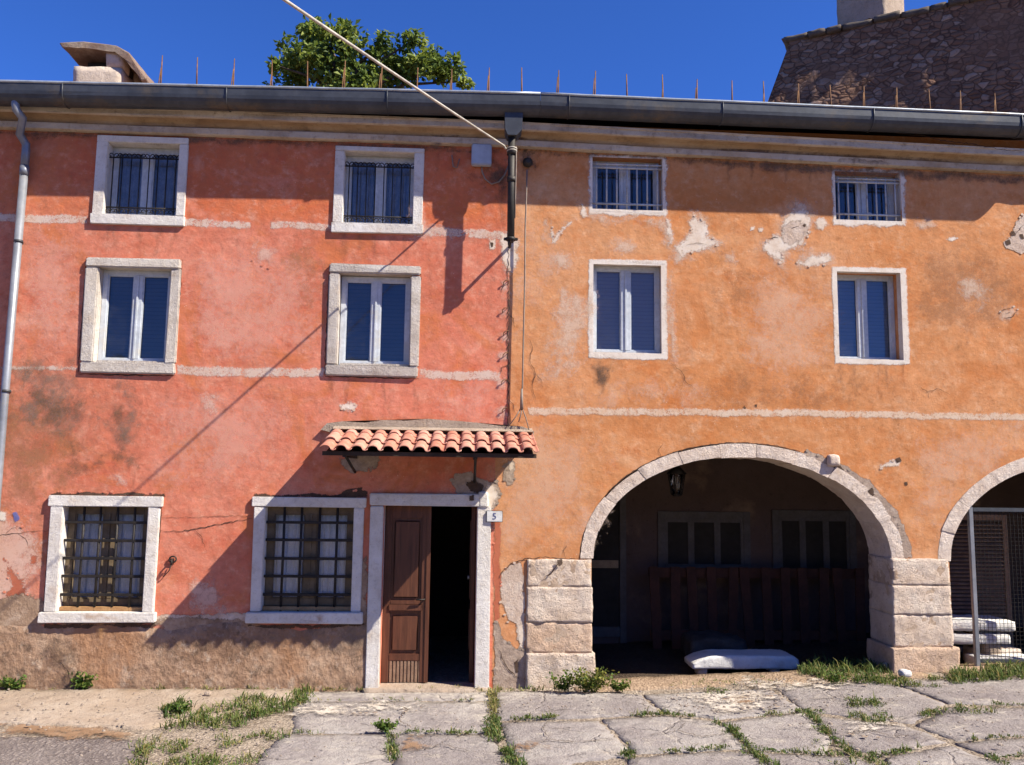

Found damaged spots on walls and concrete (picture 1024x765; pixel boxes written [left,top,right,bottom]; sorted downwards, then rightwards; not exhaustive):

peeling [648,214,734,263]
peeling [750,203,831,267]
spalling [1004,213,1024,254]
crack [159,507,252,546]
crack [0,528,85,624]
peeling [0,513,368,631]
spalling [450,460,526,690]